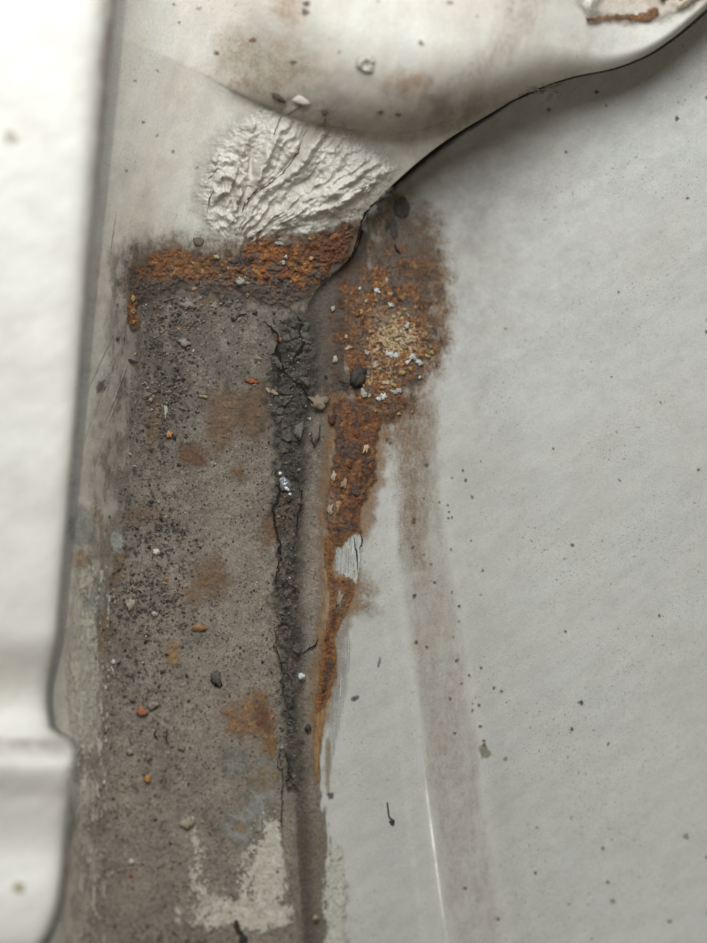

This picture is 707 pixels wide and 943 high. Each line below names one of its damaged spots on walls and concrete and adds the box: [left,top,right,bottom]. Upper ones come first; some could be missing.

rust [578,0,694,24]
crack [266,314,309,398]
rust [115,187,451,786]
crack [271,470,303,599]
crack [273,622,318,710]